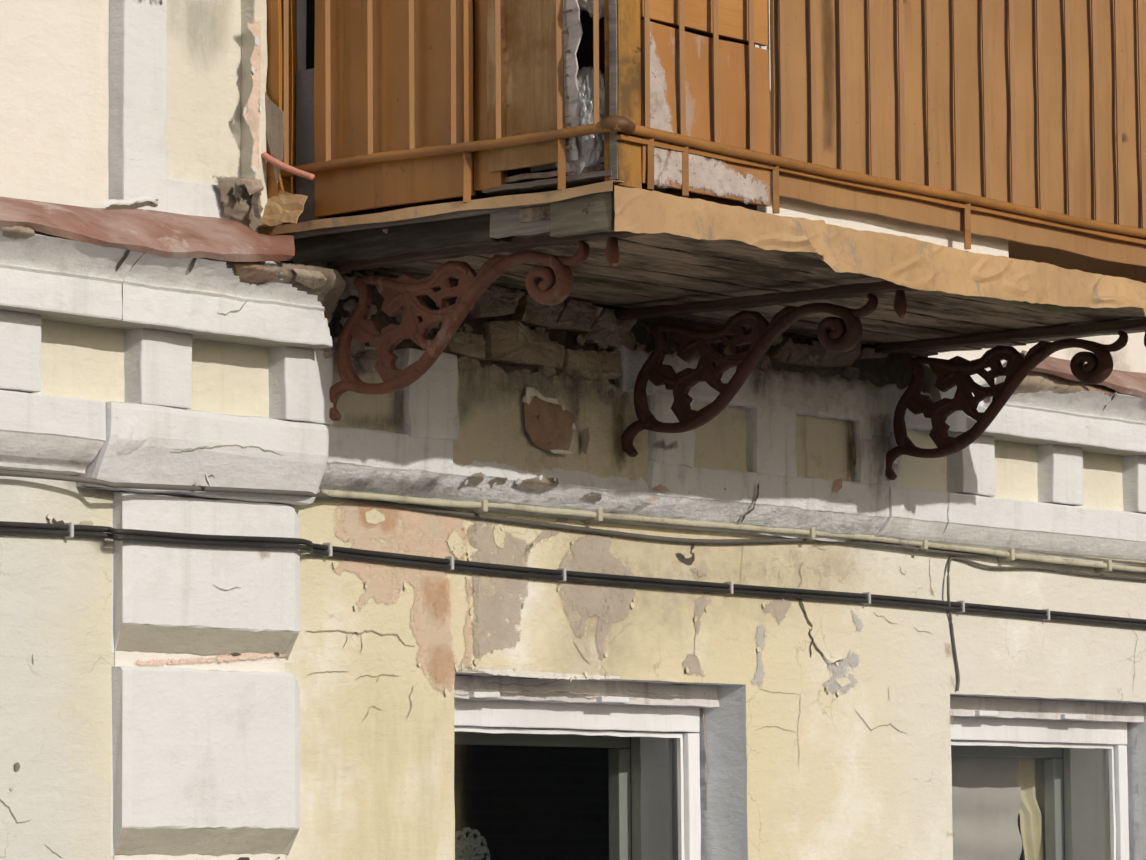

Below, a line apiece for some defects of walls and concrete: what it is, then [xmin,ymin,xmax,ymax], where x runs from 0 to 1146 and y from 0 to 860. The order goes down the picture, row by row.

spalling [224,261,378,374]
flaking render [443,284,649,491]
spalling [757,334,888,380]
leakage [848,372,893,477]
spalling [583,492,607,501]
crack [306,630,413,722]
peeling [333,502,621,696]
peeling [557,534,636,660]
peeling [682,653,704,676]
peeling [752,597,793,685]
crack [740,483,844,665]